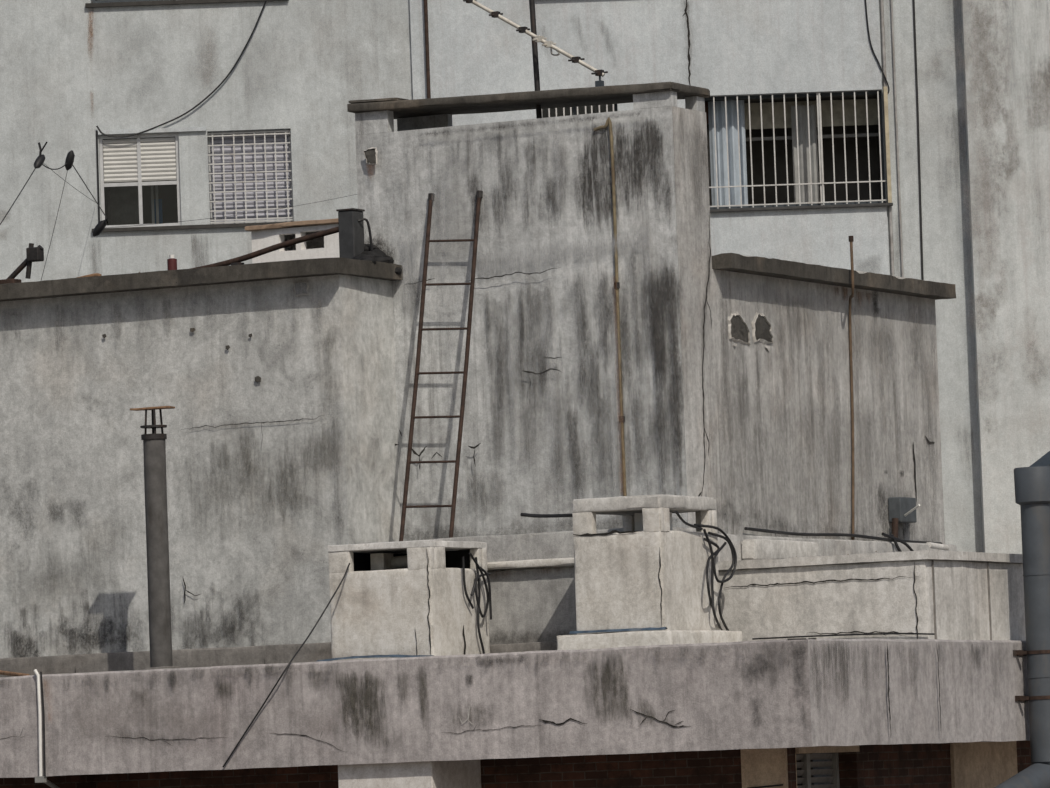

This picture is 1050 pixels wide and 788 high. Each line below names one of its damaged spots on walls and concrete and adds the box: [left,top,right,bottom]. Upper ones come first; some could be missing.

crack [682,0,691,86]
leakage [583,126,660,216]
spalling [727,311,774,350]
leakage [60,622,129,654]
crack [447,707,587,734]
crack [630,709,691,728]
crack [114,736,226,744]